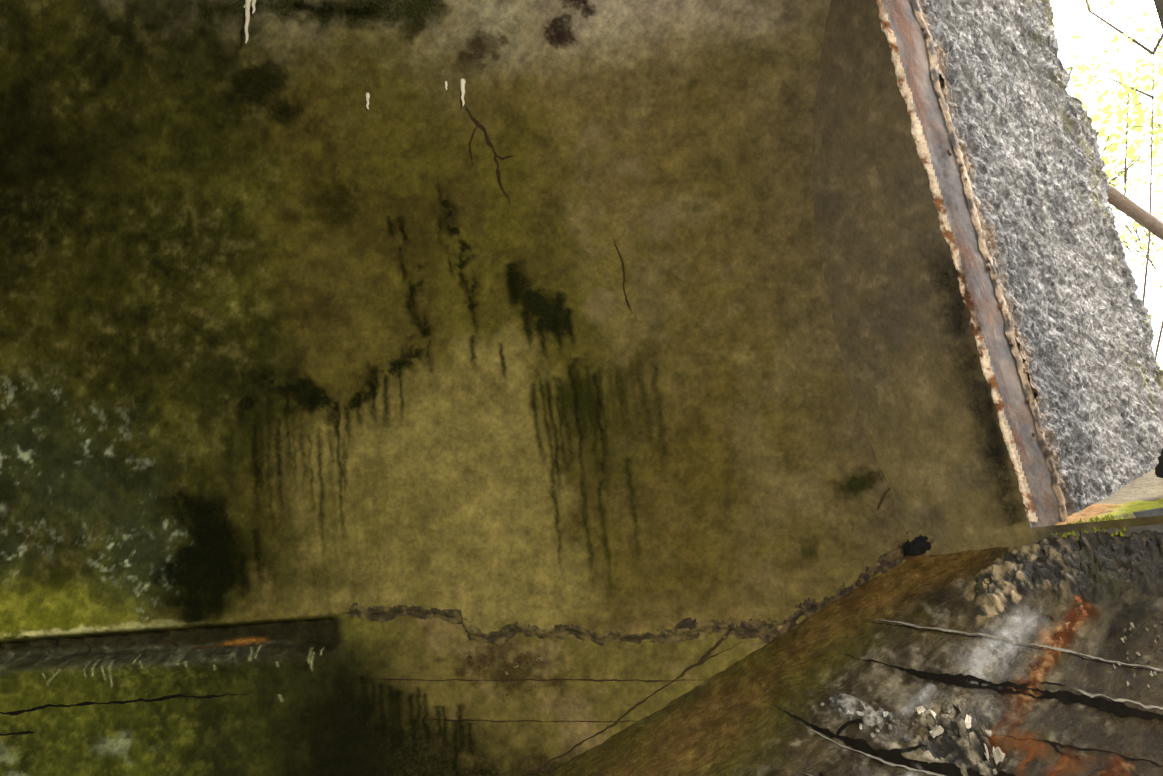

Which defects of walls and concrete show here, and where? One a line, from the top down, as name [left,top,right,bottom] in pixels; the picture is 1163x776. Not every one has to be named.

damp [197,0,447,43]
damp [545,0,593,46]
peeling [876,0,1038,522]
damp [507,264,573,351]
spalling [910,0,1163,618]
damp [238,216,431,494]
damp [155,491,272,622]
crack [0,694,249,736]
crack [771,704,1016,776]
crack [844,654,1163,720]
crack [862,616,1163,673]
corrosion [1007,595,1092,725]